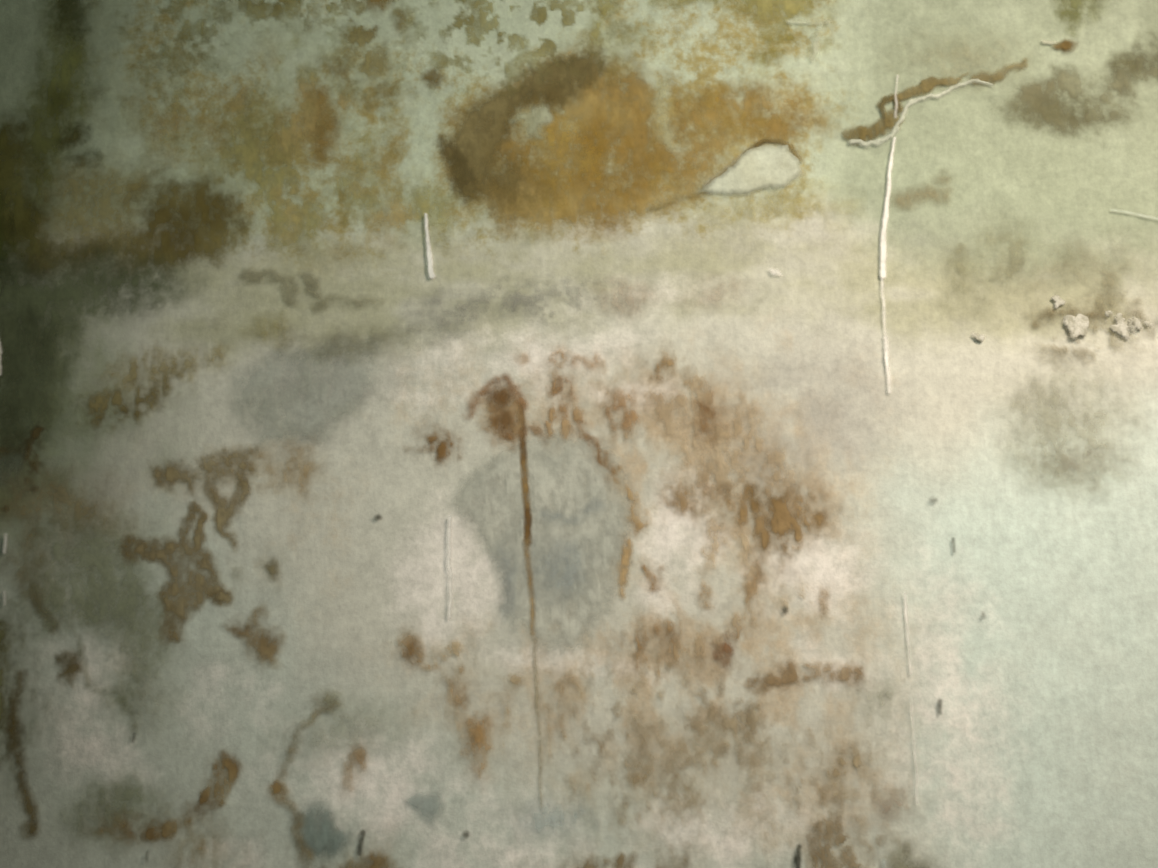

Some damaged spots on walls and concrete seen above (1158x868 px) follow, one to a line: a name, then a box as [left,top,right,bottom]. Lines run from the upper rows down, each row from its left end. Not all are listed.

damp [441,0,813,230]
crack [844,59,1027,146]
damp [1011,54,1158,132]
damp [336,139,454,231]
flaking render [703,139,802,194]
damp [0,0,412,654]
peeling [122,449,255,642]
rust [471,376,645,628]
damp [57,653,81,680]
rust [401,636,464,673]
damp [0,668,37,835]
rust [347,747,365,769]